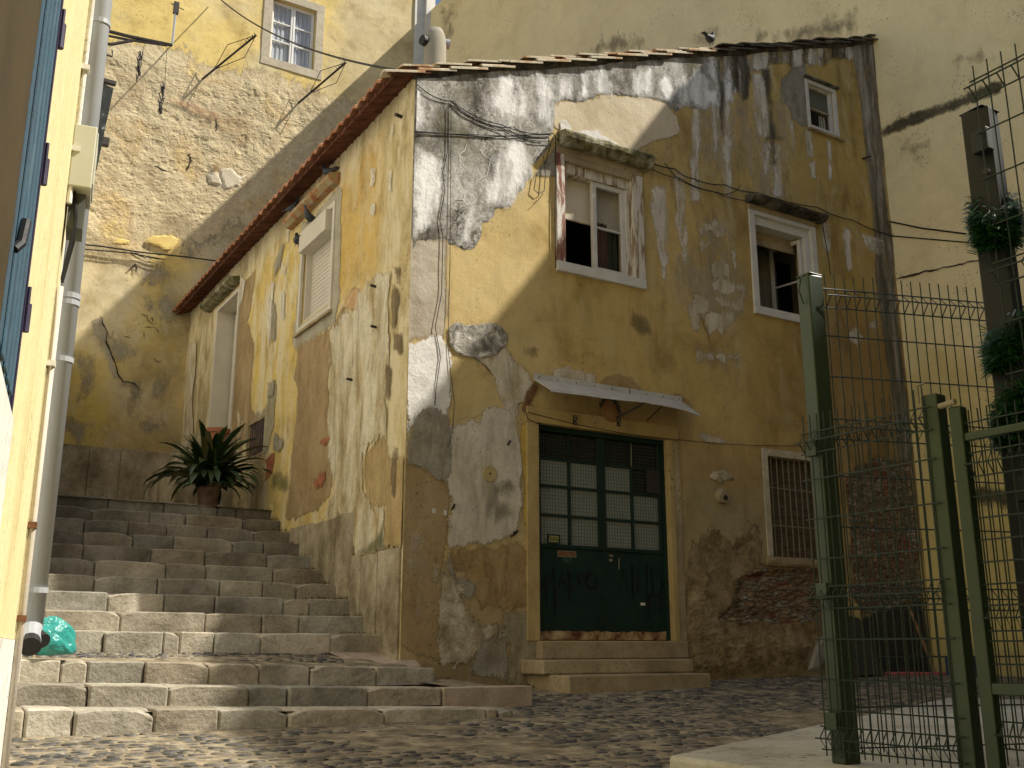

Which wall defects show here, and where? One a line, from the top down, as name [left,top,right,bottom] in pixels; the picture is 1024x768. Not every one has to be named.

crack [101,314,172,390]
spalling [85,37,356,285]
peeling [285,289,359,521]
peeling [363,346,533,670]
peeling [391,44,913,461]
spalling [717,567,822,626]
damp [843,228,884,272]
damp [882,82,1002,136]